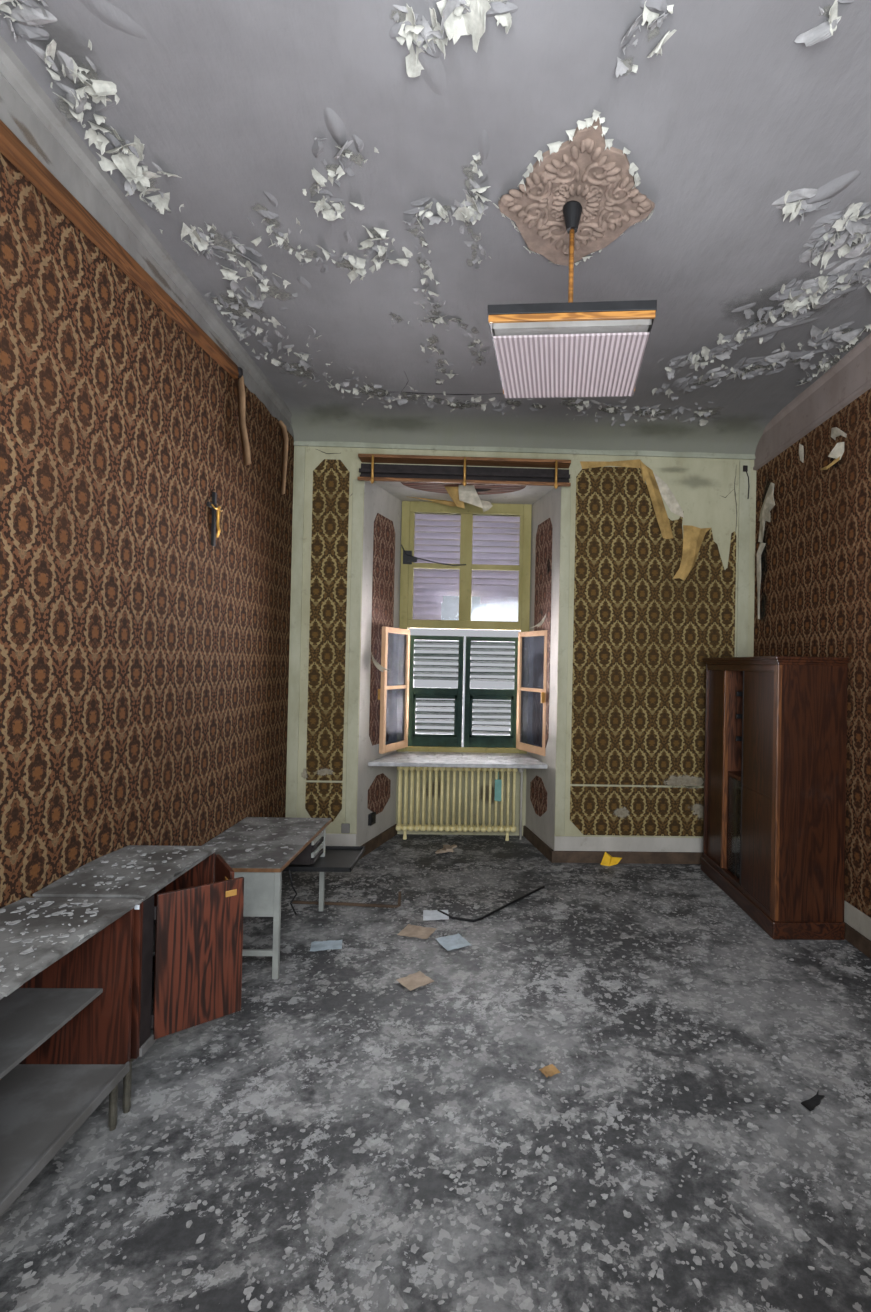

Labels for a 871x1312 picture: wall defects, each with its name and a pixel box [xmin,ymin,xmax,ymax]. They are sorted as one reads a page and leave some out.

peeling [0,0,559,418]
peeling [517,109,641,191]
peeling [615,0,677,78]
peeling [561,188,871,427]